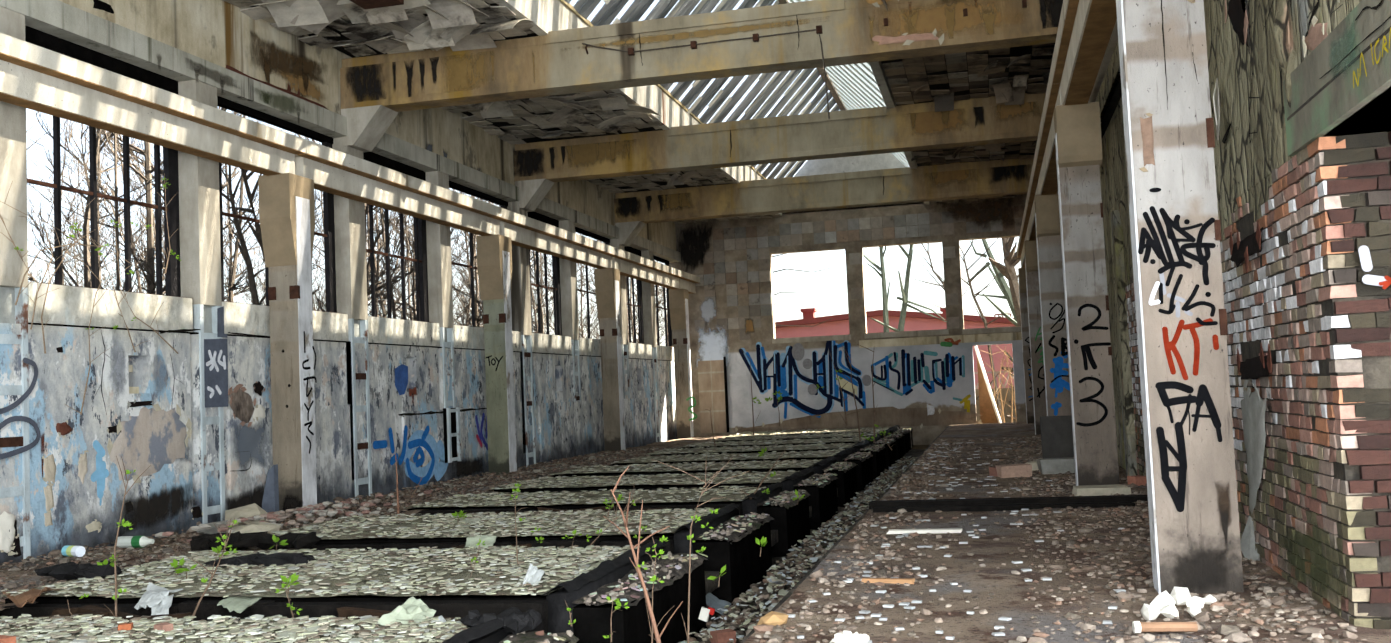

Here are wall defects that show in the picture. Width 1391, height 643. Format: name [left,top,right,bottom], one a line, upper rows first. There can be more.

spalling [872,28,944,45]
crack [1161,0,1198,110]
spalling [1302,16,1328,57]
crack [1248,0,1391,79]
crack [1249,66,1282,166]
spalling [107,400,192,483]
spalling [228,381,266,427]
spalling [191,506,203,520]
damp [1176,512,1228,591]